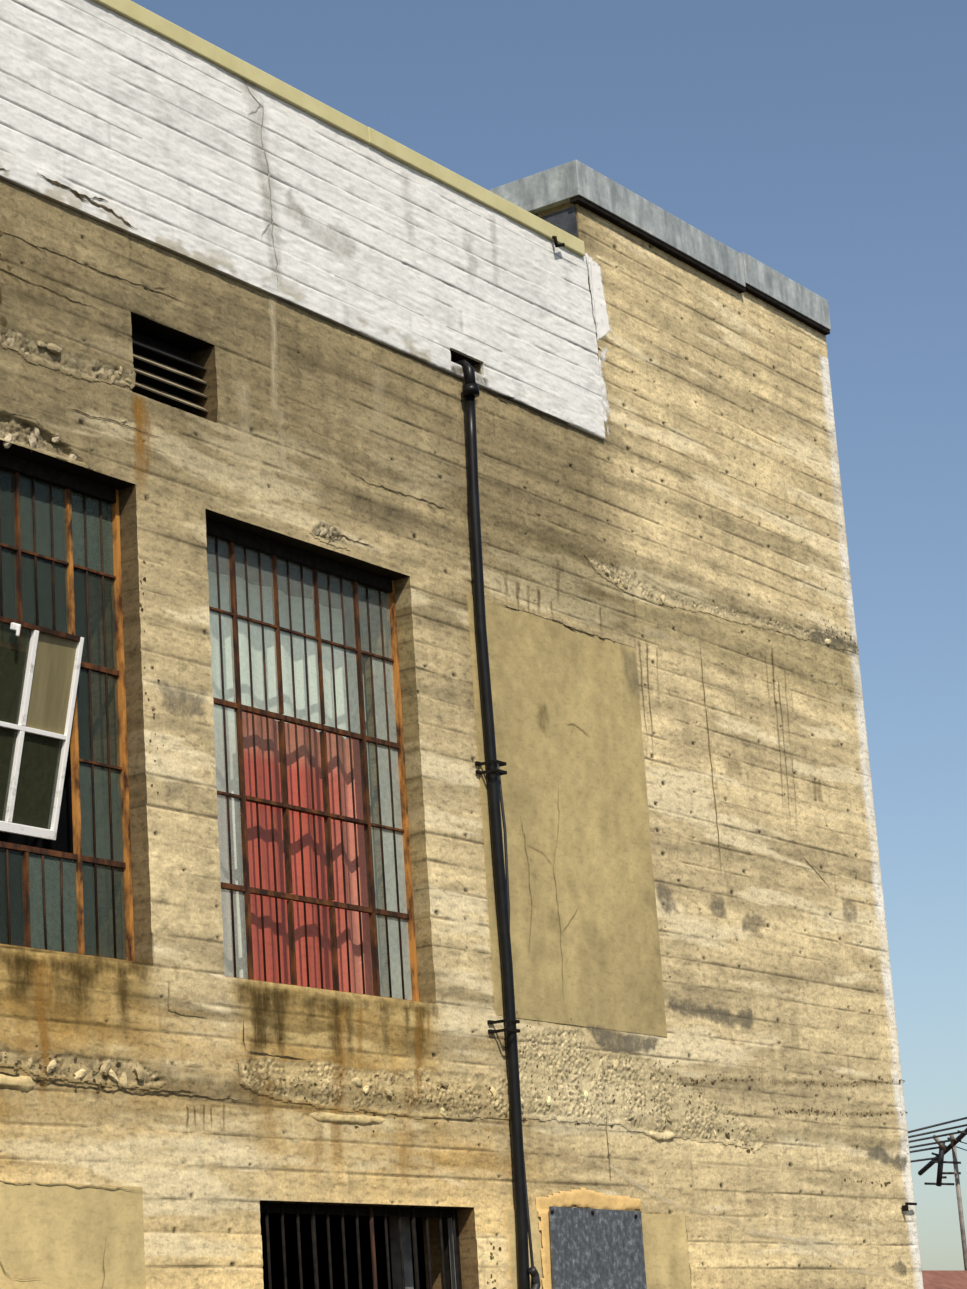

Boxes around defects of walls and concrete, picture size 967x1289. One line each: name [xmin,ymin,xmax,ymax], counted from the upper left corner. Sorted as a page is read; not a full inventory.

crack [0,168,138,229]
crack [245,81,278,289]
crack [0,230,195,312]
spalling [0,409,93,470]
damp [3,953,33,993]
spalling [0,1037,167,1093]
spalling [235,1018,904,1153]